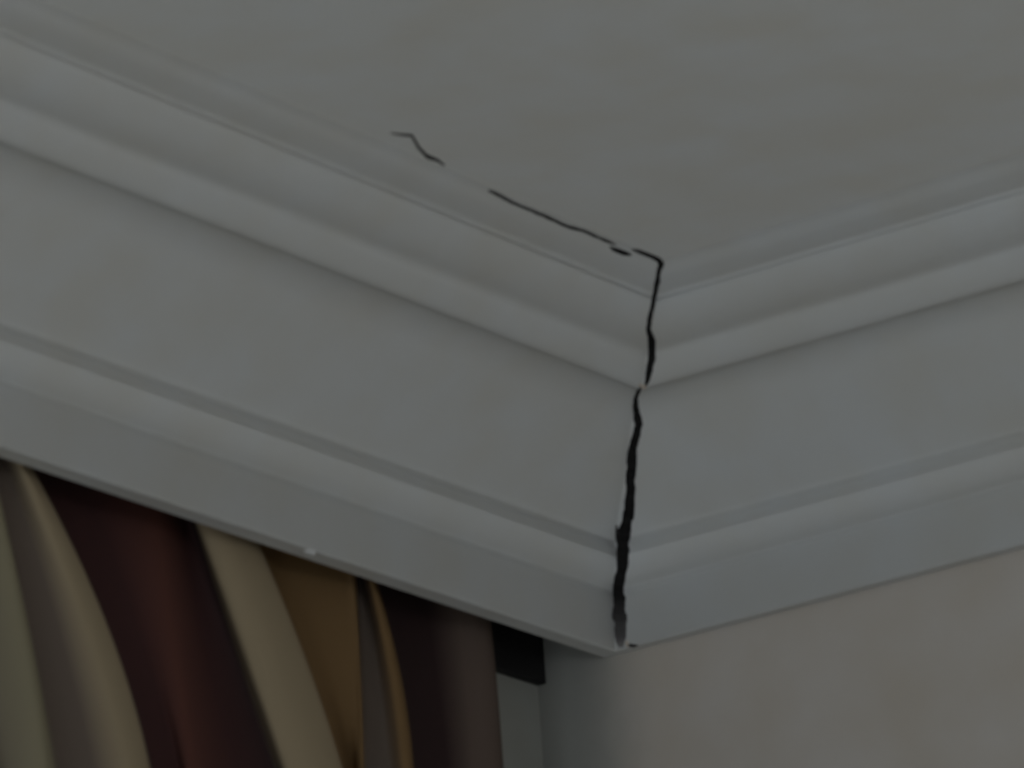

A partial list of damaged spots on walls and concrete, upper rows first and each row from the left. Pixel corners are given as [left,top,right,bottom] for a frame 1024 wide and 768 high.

crack [390,132,445,166]
crack [488,190,664,648]